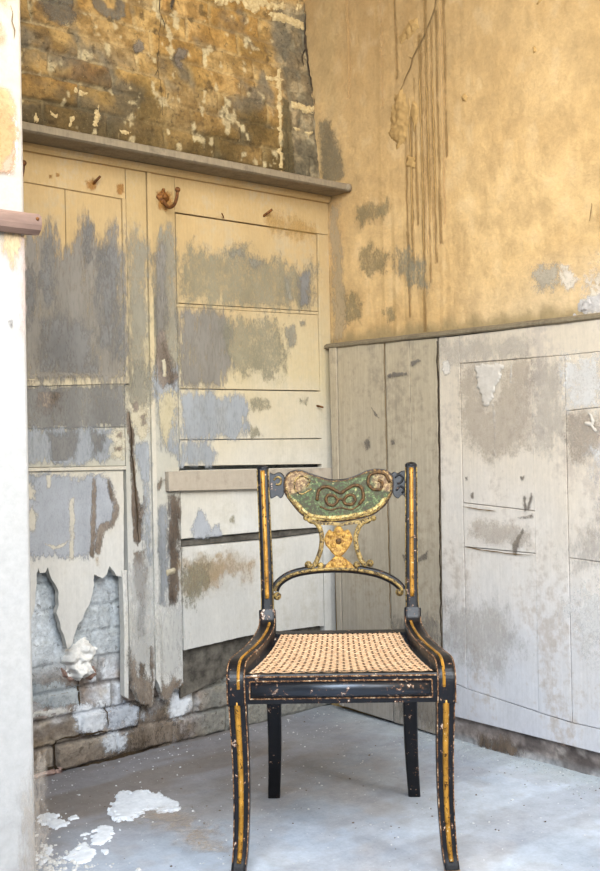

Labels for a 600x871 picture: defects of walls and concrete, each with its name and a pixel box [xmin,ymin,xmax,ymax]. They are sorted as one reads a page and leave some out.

crack [154,0,165,115]
crack [302,12,315,104]
spalling [573,293,600,316]
peeling [475,362,512,456]
peeling [29,469,117,560]